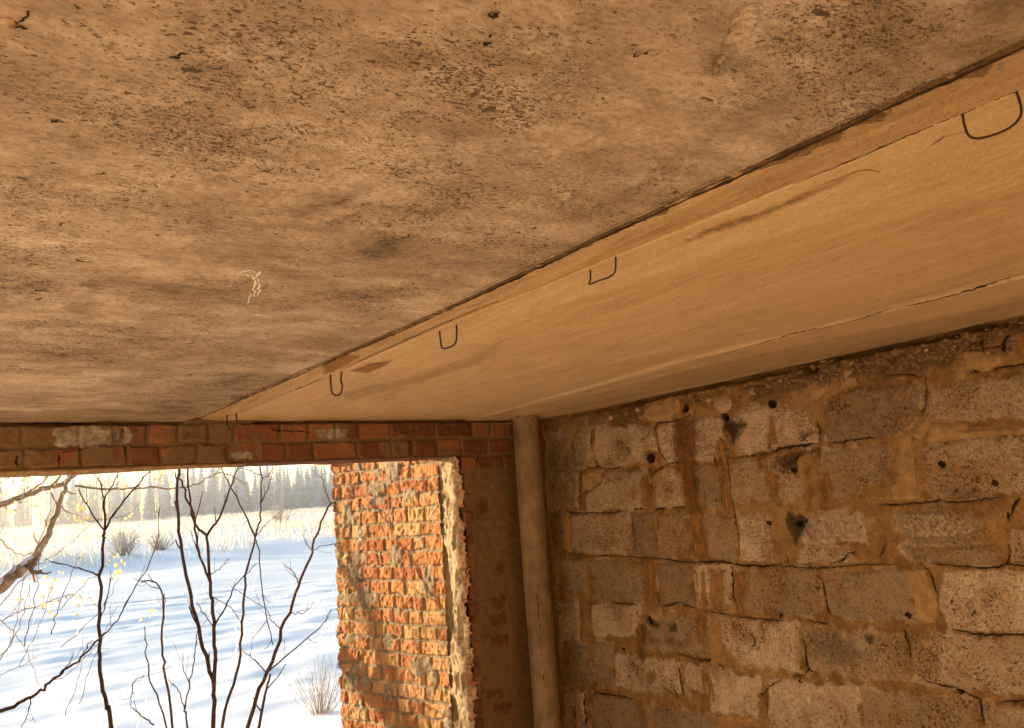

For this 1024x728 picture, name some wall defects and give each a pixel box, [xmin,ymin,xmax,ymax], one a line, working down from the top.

leakage [704,192,811,233]
crack [193,46,1024,433]
peeling [118,425,134,448]
crack [569,415,898,712]
crack [880,497,1024,592]
crack [956,629,1024,637]
crack [925,681,1024,723]